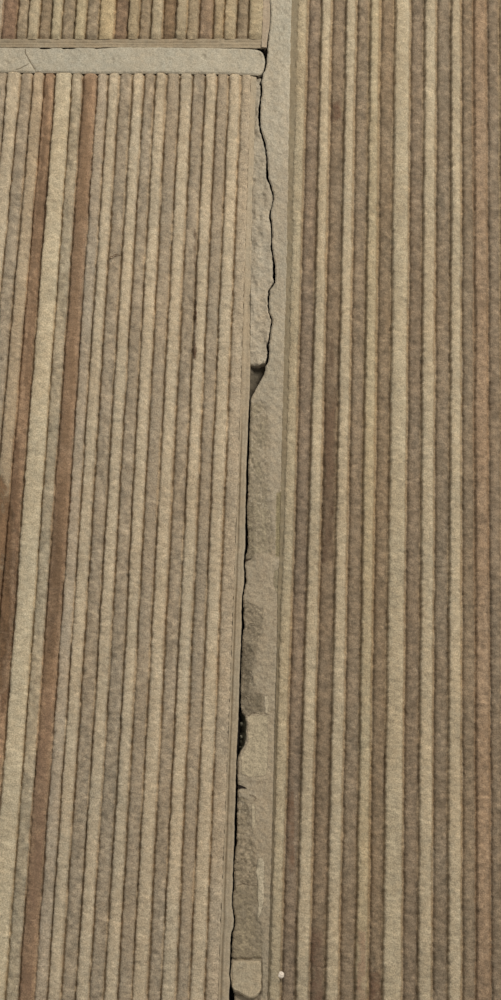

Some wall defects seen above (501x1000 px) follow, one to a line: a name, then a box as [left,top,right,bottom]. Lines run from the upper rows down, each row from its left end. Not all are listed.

crack [7,8,276,364]
crack [229,399,270,1000]